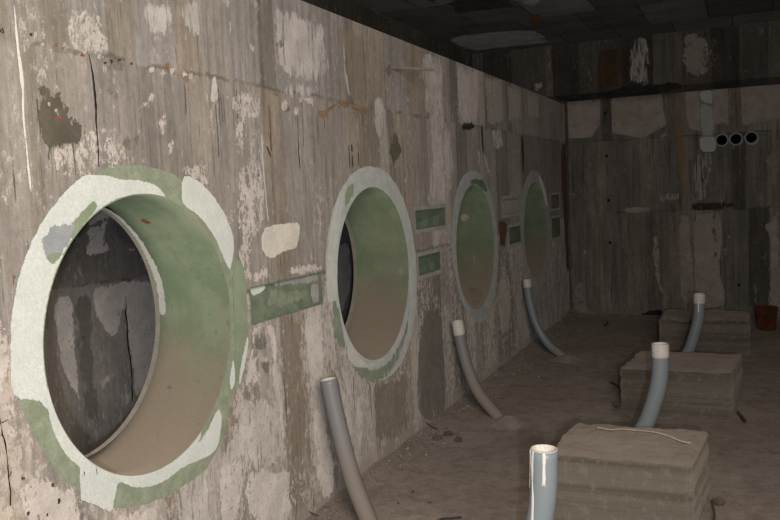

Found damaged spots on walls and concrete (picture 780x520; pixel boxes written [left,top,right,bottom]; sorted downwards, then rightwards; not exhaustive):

damp [36,84,86,174]
crack [89,55,99,166]
peeling [274,8,330,147]
peeling [375,97,384,137]
peeling [629,37,649,83]
crack [125,297,133,402]
crack [0,419,12,518]